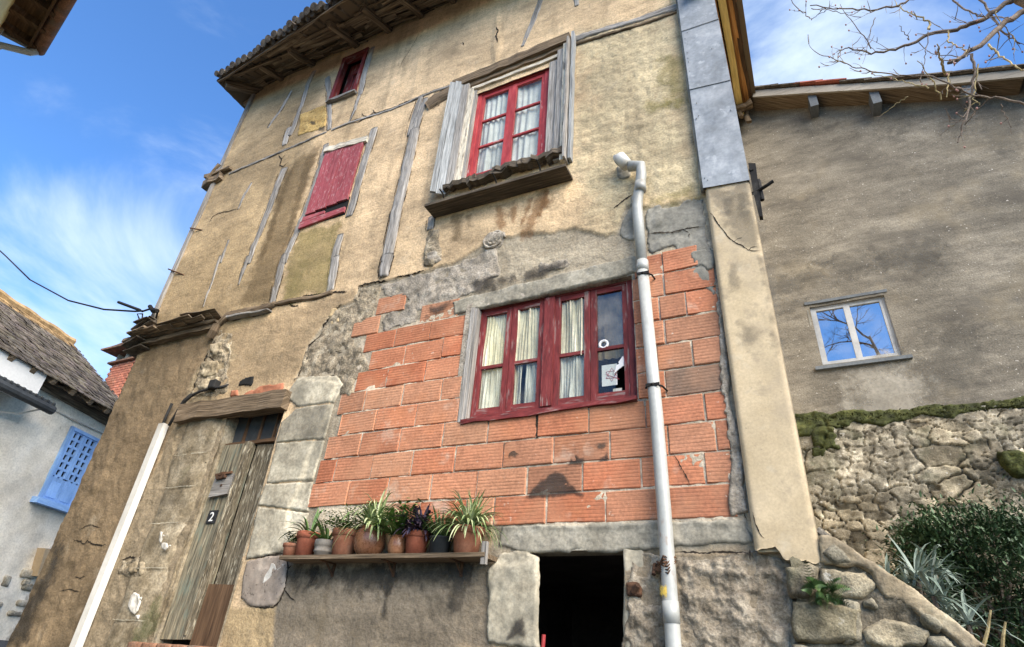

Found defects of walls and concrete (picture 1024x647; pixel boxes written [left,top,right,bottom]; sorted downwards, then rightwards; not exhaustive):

crack [649,213,759,251]
flaking render [191,248,501,397]
leakage [528,472,582,498]